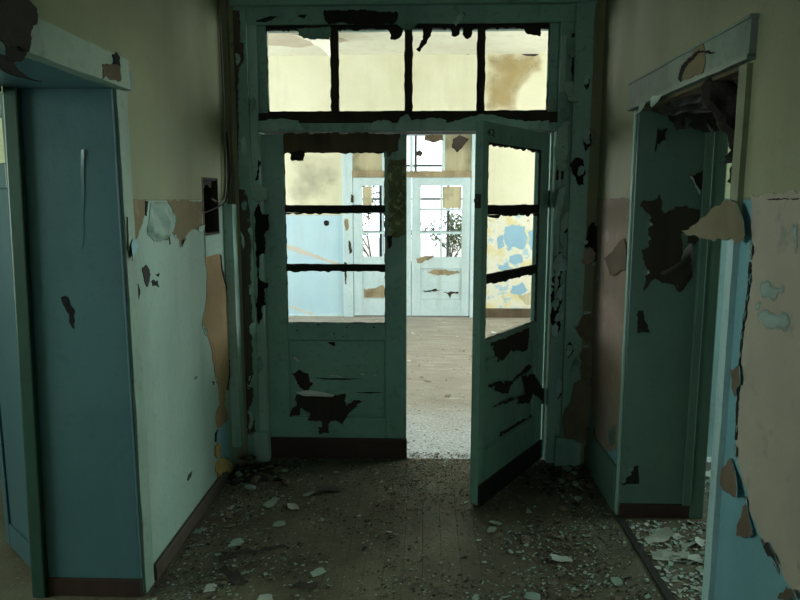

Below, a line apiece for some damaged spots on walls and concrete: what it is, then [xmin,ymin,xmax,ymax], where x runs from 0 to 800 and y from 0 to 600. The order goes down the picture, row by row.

peeling [0,0,41,82]
peeling [293,9,403,57]
peeling [416,26,433,52]
peeling [450,12,474,39]
leakage [490,55,538,106]
peeling [523,26,542,36]
peeling [486,214,533,309]
peeling [640,194,700,292]
flaking render [202,254,230,459]
flaking render [562,197,630,451]
flaking render [720,190,800,600]
peeling [147,333,707,600]